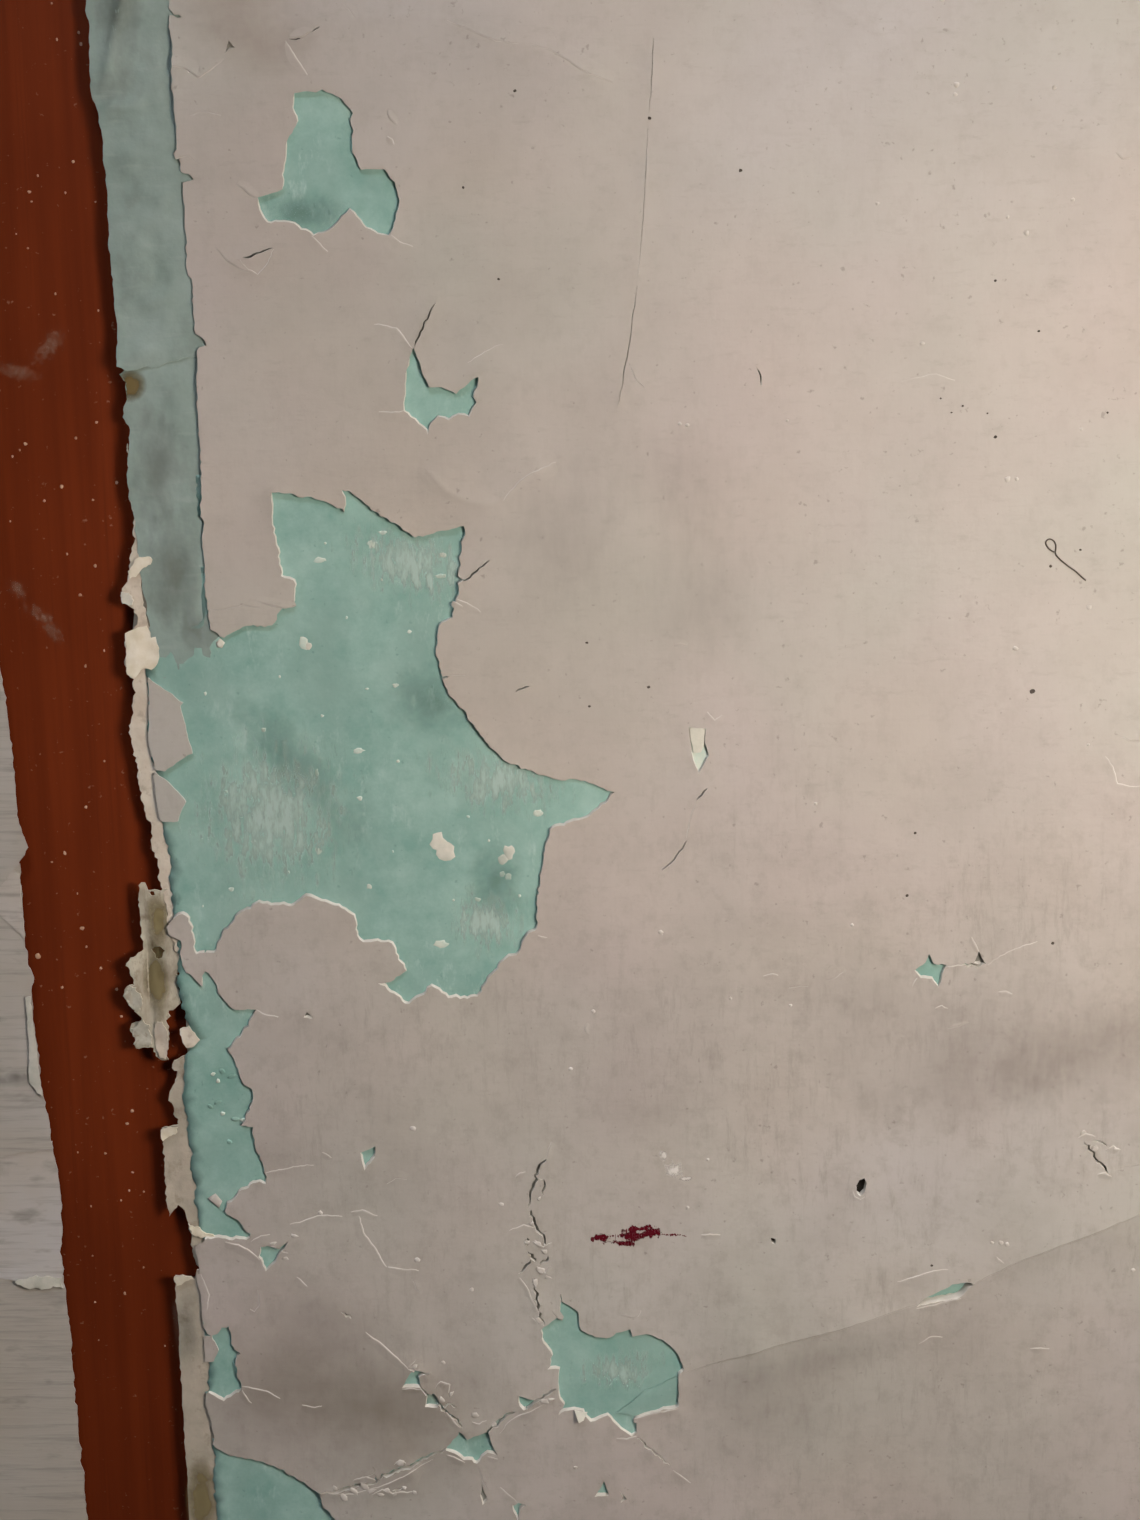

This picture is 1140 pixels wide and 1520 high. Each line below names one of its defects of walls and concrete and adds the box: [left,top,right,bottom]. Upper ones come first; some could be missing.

peeling [85,0,614,1271]
crack [1078,1130,1121,1180]
crack [351,1170,424,1295]
crack [498,1142,555,1326]
peeling [212,1439,335,1520]
crack [321,1312,557,1506]
peeling [541,1295,684,1436]